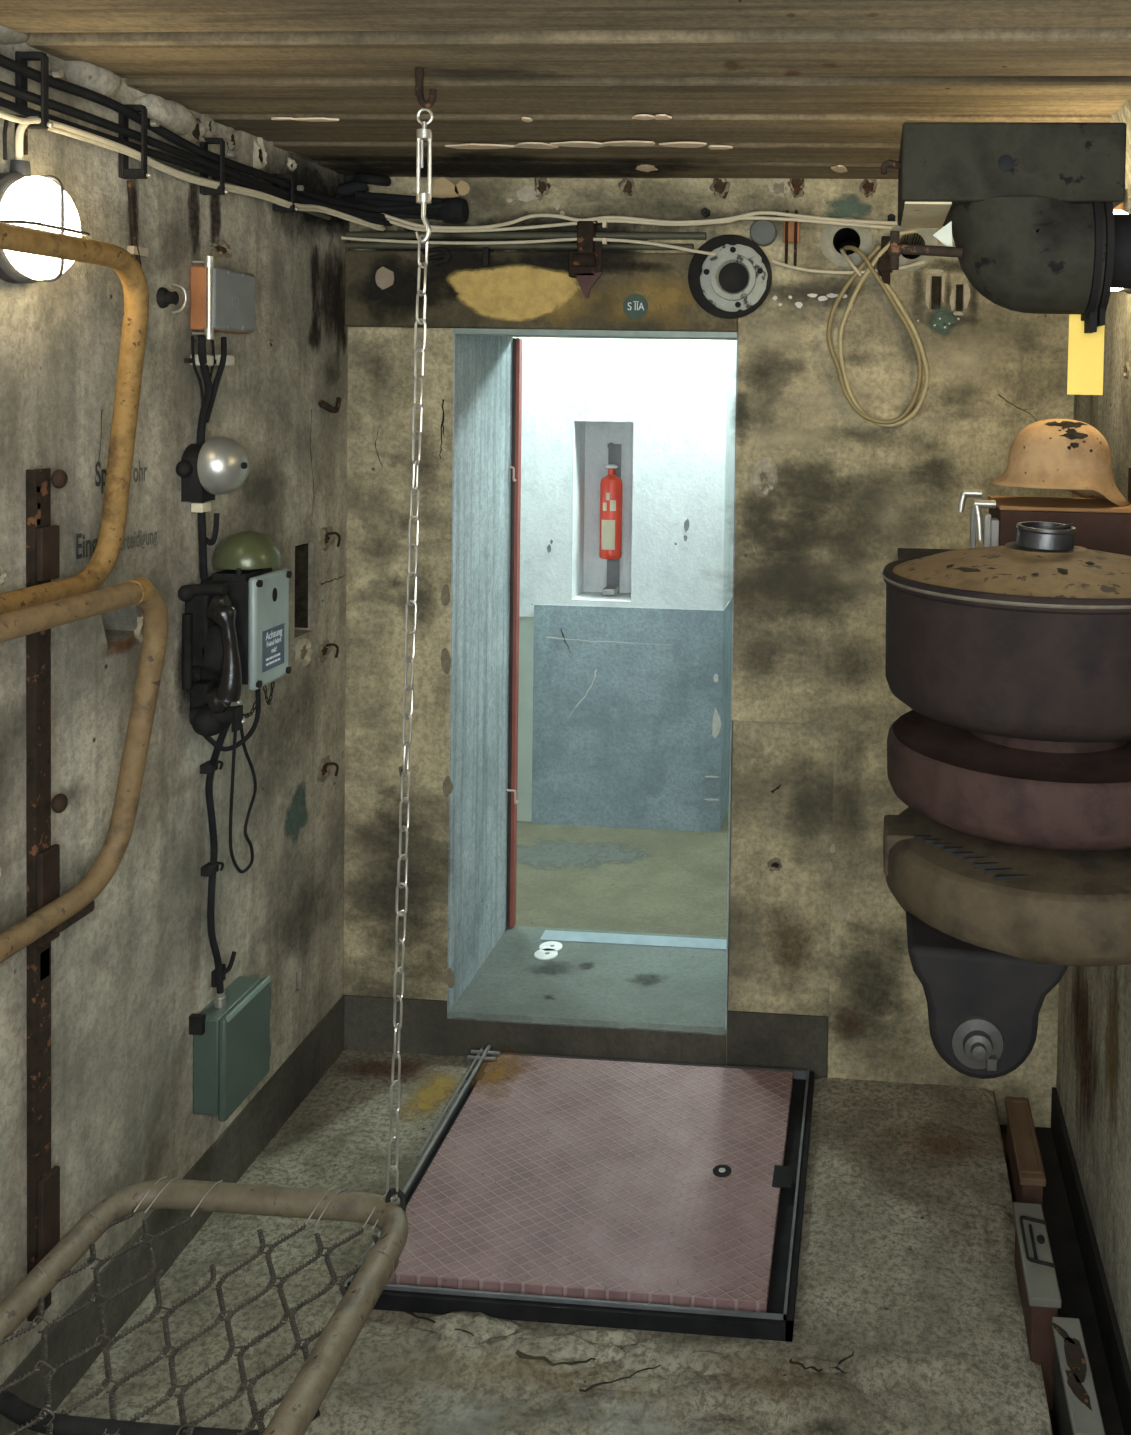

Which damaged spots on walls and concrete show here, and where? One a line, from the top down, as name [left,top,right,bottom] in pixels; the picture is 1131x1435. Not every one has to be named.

damp [734,398,747,430]
damp [741,470,848,604]
damp [411,589,424,609]
damp [365,814,425,949]
spalling [418,1311,677,1393]
spalling [687,1351,742,1376]